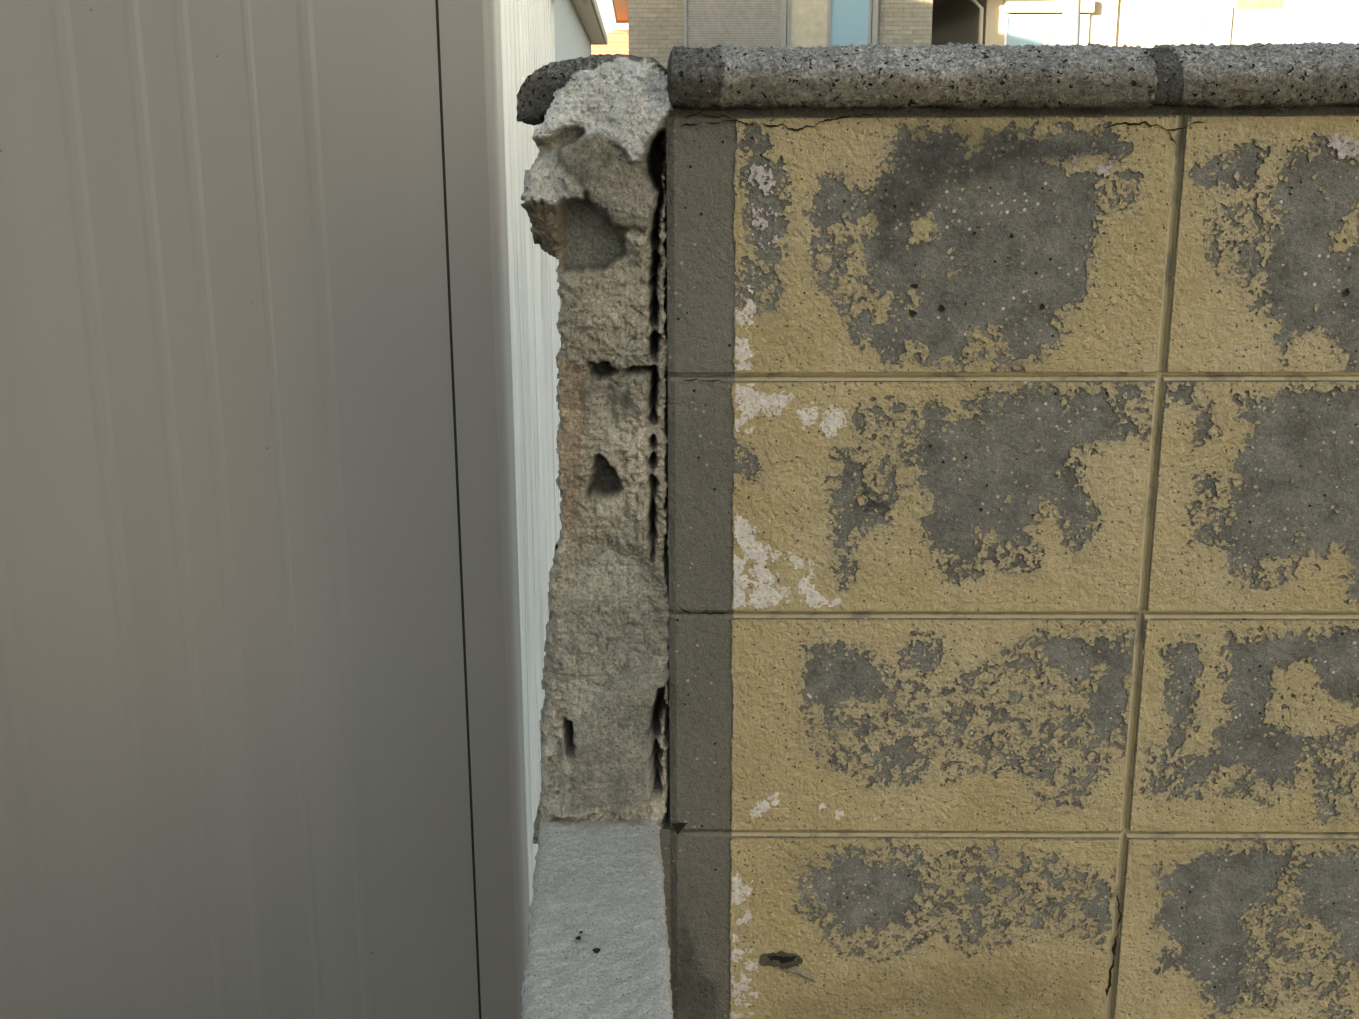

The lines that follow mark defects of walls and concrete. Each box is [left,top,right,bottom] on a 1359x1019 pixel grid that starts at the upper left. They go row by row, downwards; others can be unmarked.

spalling [531,127,585,168]
spalling [549,116,669,613]
peeling [735,118,1359,608]
spalling [533,661,670,844]
peeling [795,620,1134,810]
peeling [1141,625,1359,823]
peeling [783,838,1115,963]
crack [1105,895,1122,996]
peeling [1149,840,1359,1019]